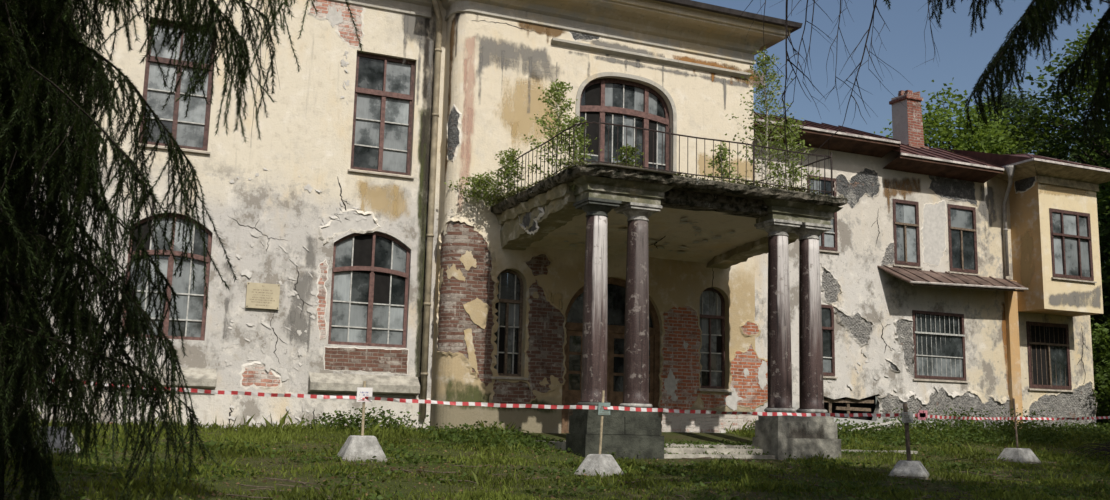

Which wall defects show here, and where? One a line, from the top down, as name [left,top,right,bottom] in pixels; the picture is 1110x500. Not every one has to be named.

flaking render [307,0,366,104]
spalling [318,201,381,245]
leakage [360,5,435,398]
spalling [447,104,462,162]
leakage [447,12,464,116]
leakage [478,22,564,141]
spalling [833,166,881,209]
crack [227,215,313,362]
flaking render [220,229,409,390]
flaking render [436,216,567,408]
flaking render [658,305,768,433]
spalling [820,266,1010,429]